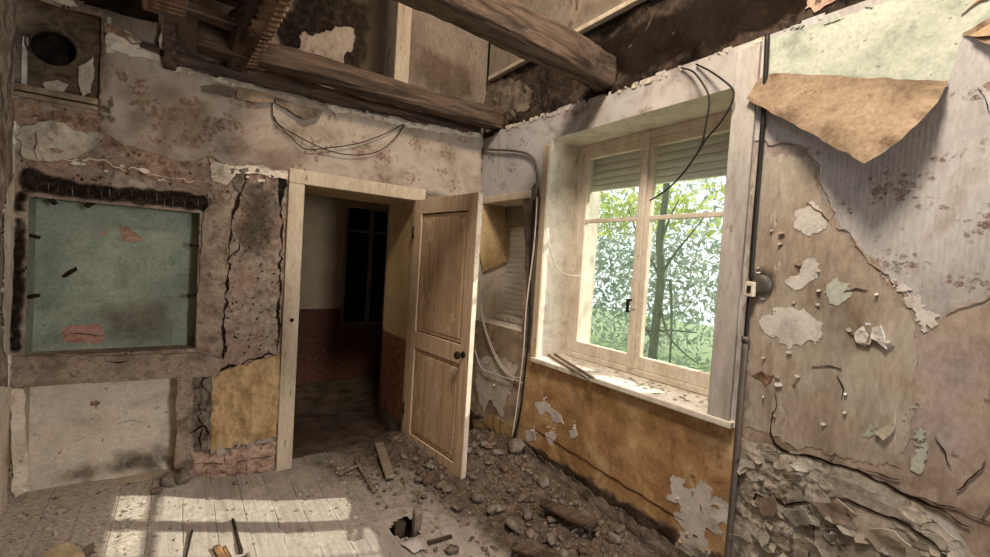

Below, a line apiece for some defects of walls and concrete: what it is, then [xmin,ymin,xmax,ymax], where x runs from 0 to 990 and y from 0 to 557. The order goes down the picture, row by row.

flaking render [743,0,990,84]
flaking render [13,96,115,134]
crack [203,174,284,380]
peeling [522,152,977,557]
flaking render [189,377,277,478]
crack [770,392,990,527]